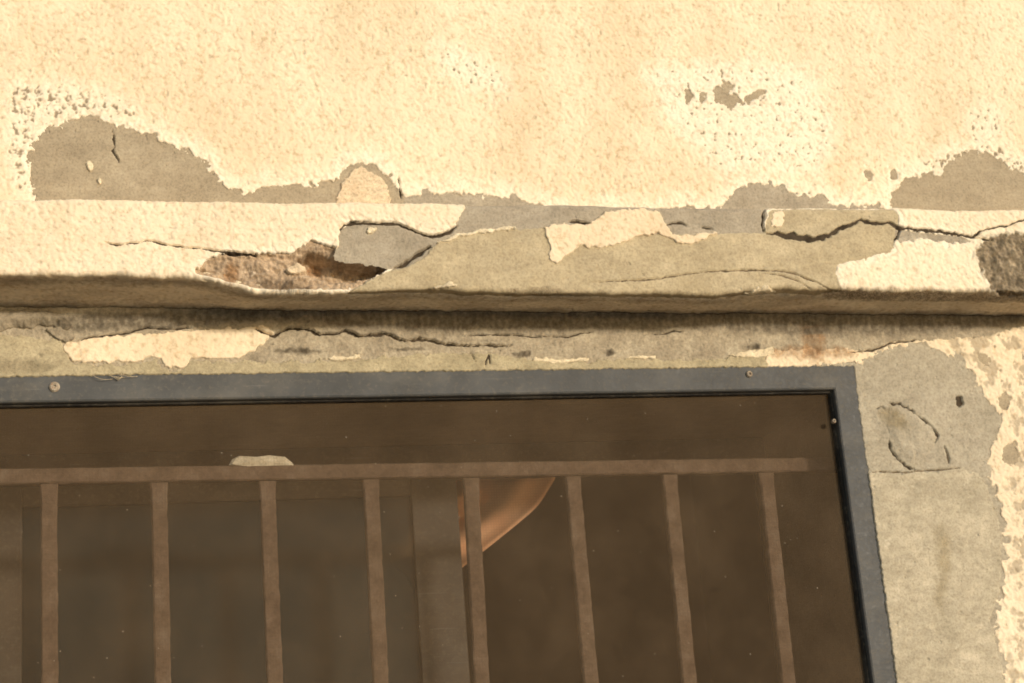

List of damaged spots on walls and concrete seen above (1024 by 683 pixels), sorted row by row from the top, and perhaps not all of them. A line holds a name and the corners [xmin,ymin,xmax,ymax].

peeling [684,76,766,111]
peeling [25,115,1024,296]
crack [110,241,256,257]
crack [339,222,457,269]
crack [761,213,1024,243]
crack [81,327,191,341]
crack [255,328,590,365]
crack [872,448,957,474]
peeling [0,306,1024,683]